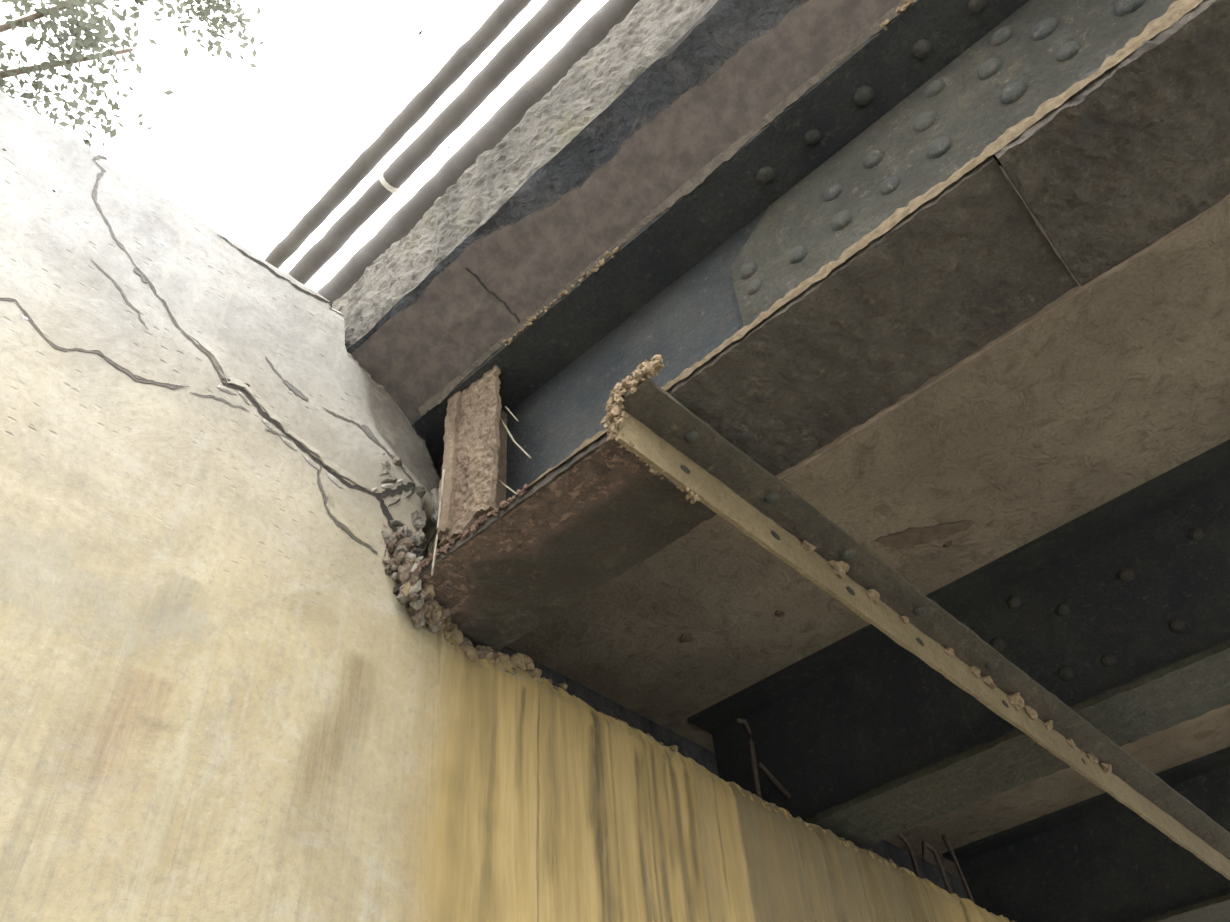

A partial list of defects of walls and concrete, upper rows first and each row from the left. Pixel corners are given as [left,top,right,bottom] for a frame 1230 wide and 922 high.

crack [0,155,416,554]
crack [465,267,520,323]
spalling [379,453,568,692]
water stain [427,643,1010,922]